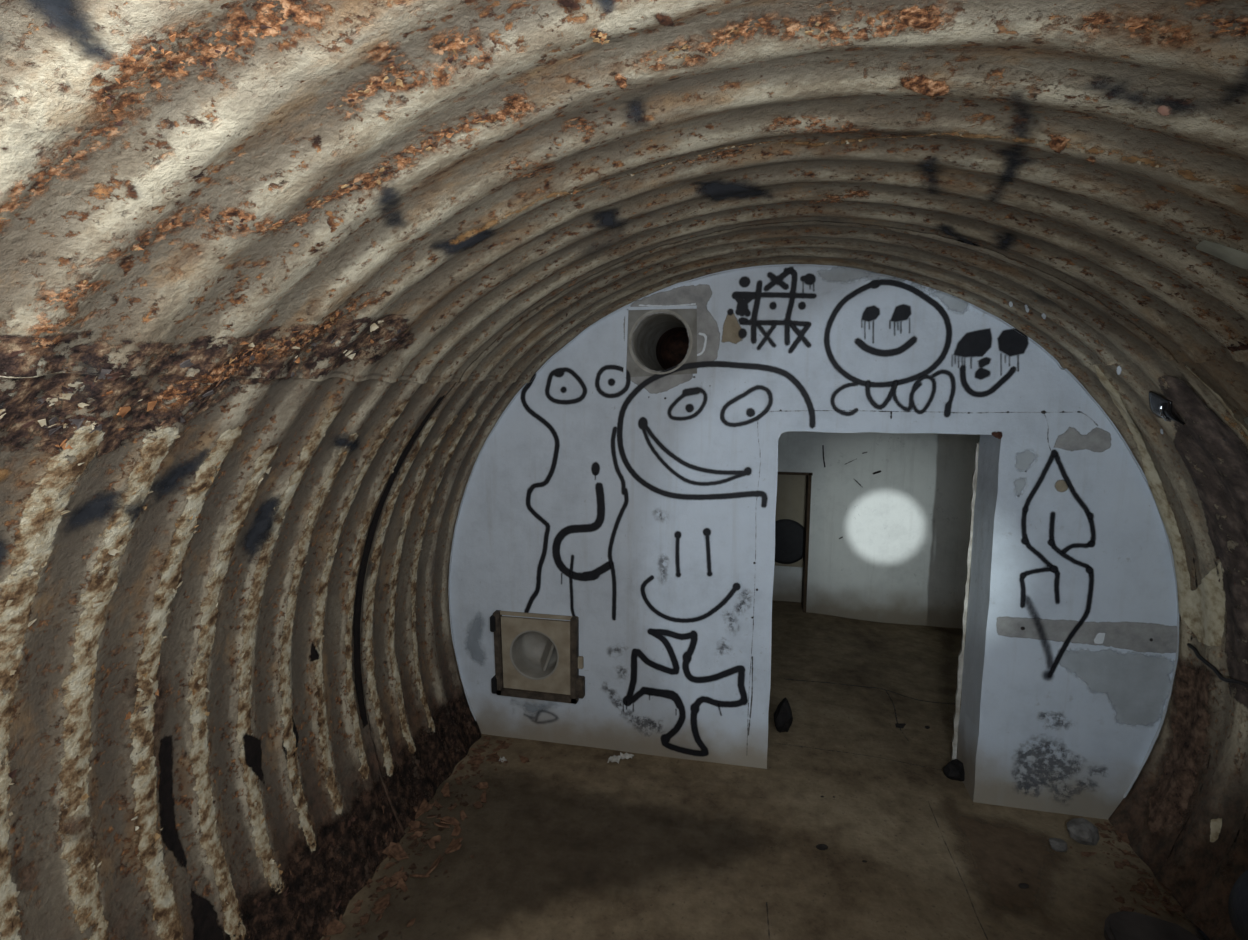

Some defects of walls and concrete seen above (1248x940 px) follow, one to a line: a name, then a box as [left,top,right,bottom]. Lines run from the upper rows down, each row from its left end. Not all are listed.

corrosion [0,0,328,229]
corrosion [325,30,492,121]
corrosion [589,28,610,44]
corrosion [635,2,951,71]
corrosion [899,74,950,97]
corrosion [1080,0,1248,45]
corrosion [109,93,534,261]
corrosion [0,274,414,459]
peeling [996,365,1248,726]
water stain [1015,741,1105,802]
corrosion [1145,658,1216,844]
peeling [1210,818,1222,842]